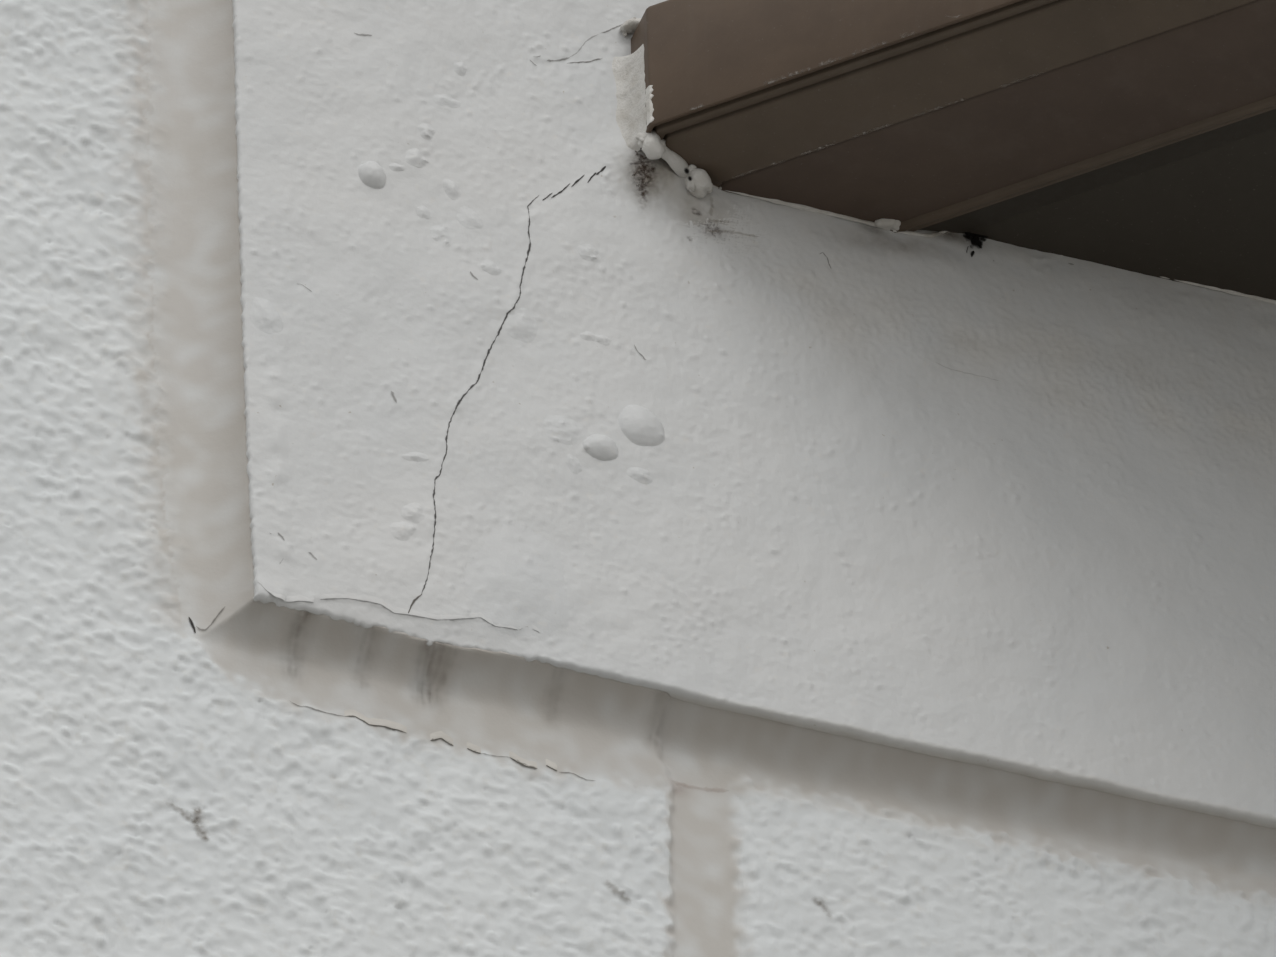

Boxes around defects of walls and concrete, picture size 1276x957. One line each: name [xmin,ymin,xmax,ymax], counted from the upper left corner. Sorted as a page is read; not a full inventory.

crack [408,166,606,613]